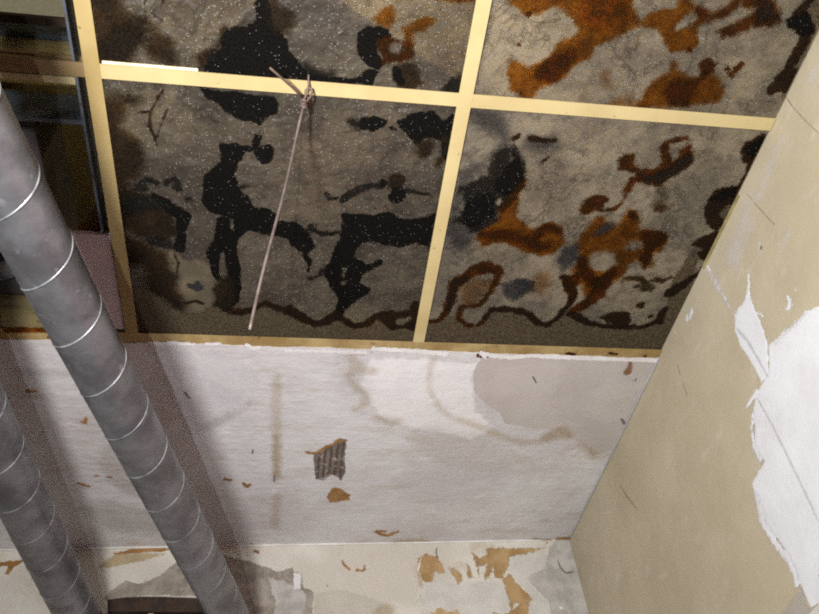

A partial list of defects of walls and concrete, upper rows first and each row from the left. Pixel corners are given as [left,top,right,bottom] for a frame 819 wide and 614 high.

leakage [91,0,176,65]
leakage [203,0,422,89]
leakage [766,0,819,96]
leakage [441,74,462,93]
leakage [347,110,454,168]
leakage [105,86,436,342]
leakage [424,133,766,350]
peeling [305,438,351,503]
spalling [103,562,195,600]
spalling [223,549,314,614]
spalling [417,537,589,614]